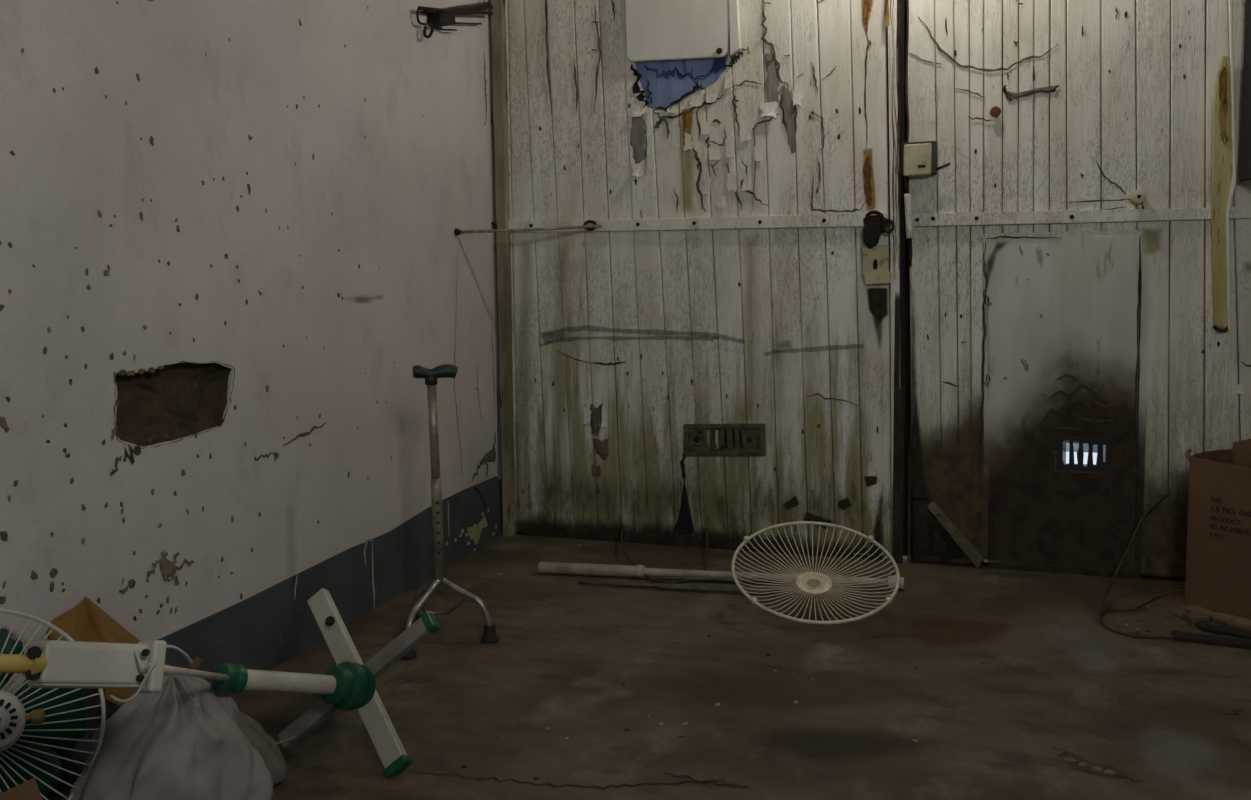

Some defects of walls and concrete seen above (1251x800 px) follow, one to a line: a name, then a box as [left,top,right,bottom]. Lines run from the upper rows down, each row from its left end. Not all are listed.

peeling [628,48,747,185]
peeling [760,0,811,153]
rust [862,0,901,280]
rust [1219,67,1228,144]
spalling [102,351,237,475]
peeling [472,432,496,482]
water stain [517,288,948,564]
peeling [445,508,497,551]
water stain [1141,484,1189,578]
crack [414,772,750,789]